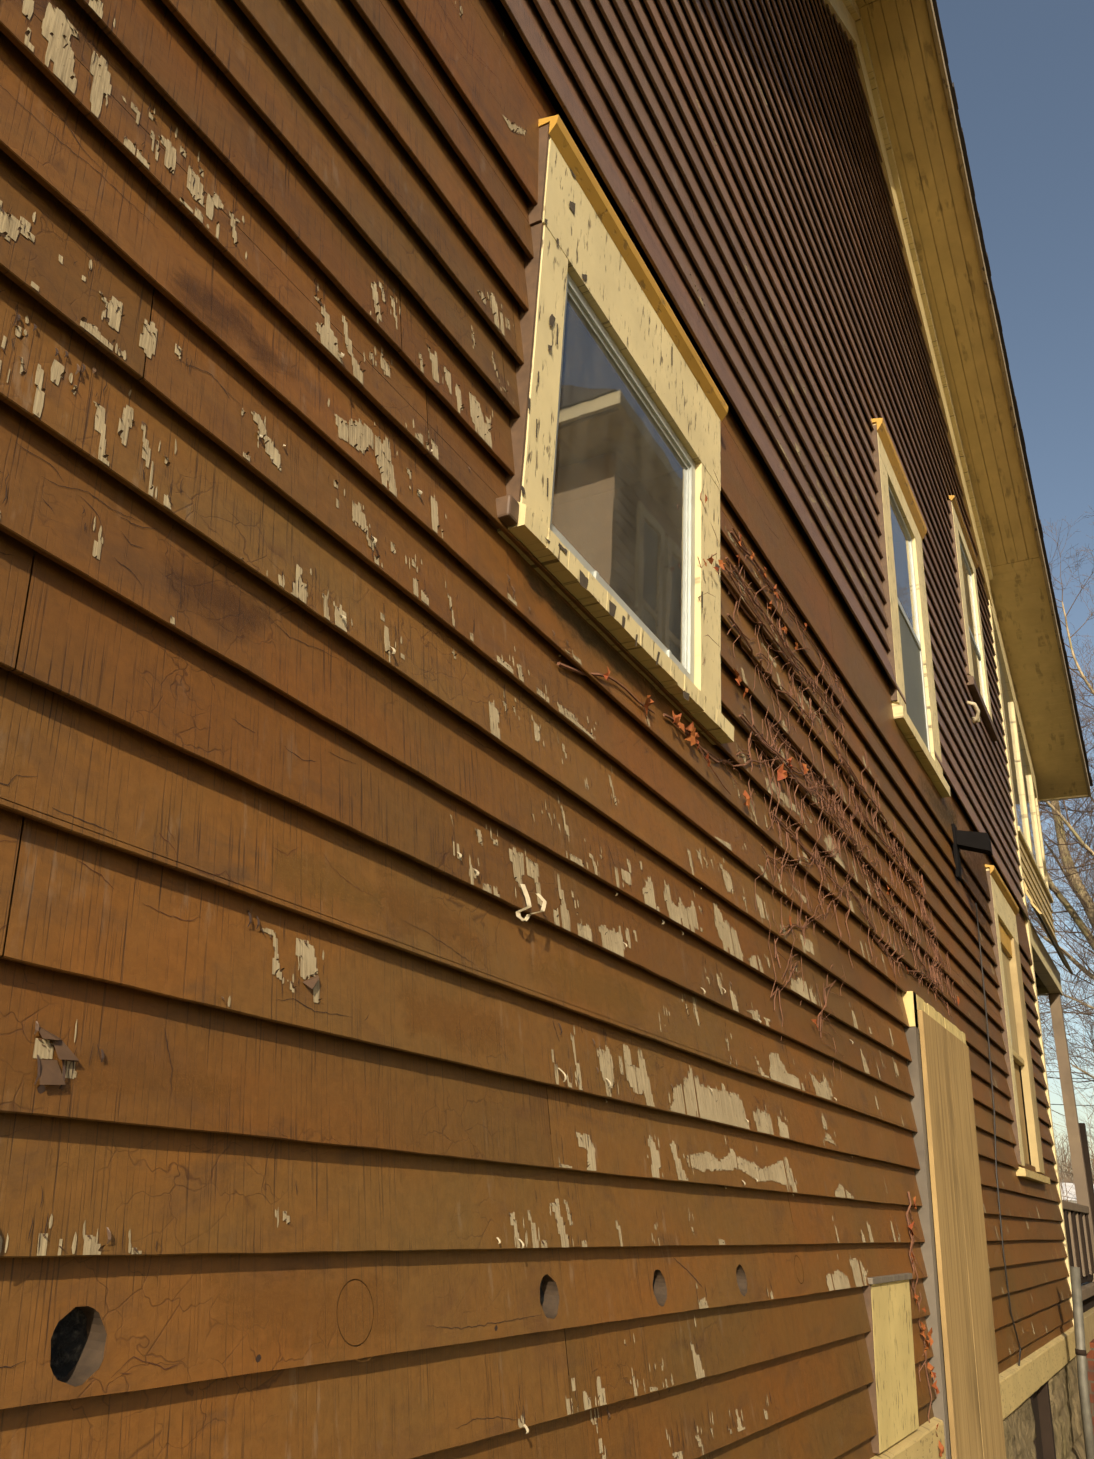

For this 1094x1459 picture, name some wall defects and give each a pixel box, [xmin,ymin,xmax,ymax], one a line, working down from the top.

peeling [22,0,247,259]
peeling [0,302,183,509]
peeling [59,254,158,360]
peeling [314,278,392,384]
peeling [328,399,447,538]
peeling [415,339,500,448]
peeling [266,556,353,632]
peeling [489,646,599,764]
peeling [450,806,637,957]
peeling [247,910,324,1003]
peeling [531,740,911,1196]
peeling [750,1045,874,1291]